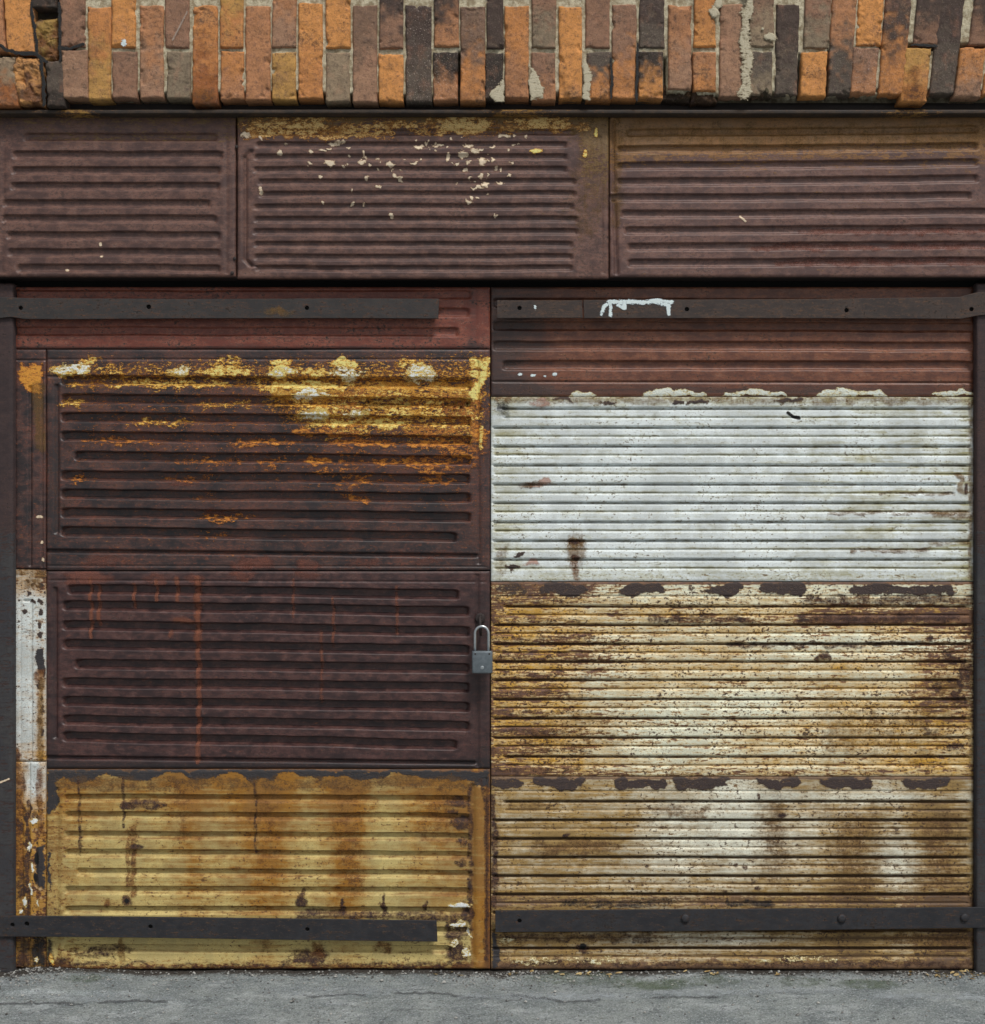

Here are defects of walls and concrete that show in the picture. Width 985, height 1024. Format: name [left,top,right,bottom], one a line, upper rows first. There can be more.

peeling [307,132,543,205]
peeling [526,387,973,406]
peeling [48,350,508,542]
corrosion [568,539,585,580]
corrosion [798,593,973,624]
corrosion [726,634,934,661]
corrosion [909,653,971,739]
corrosion [16,679,45,915]
corrosion [104,777,166,908]
corrosion [295,779,499,960]
corrosion [18,937,462,969]
peeling [445,902,475,964]